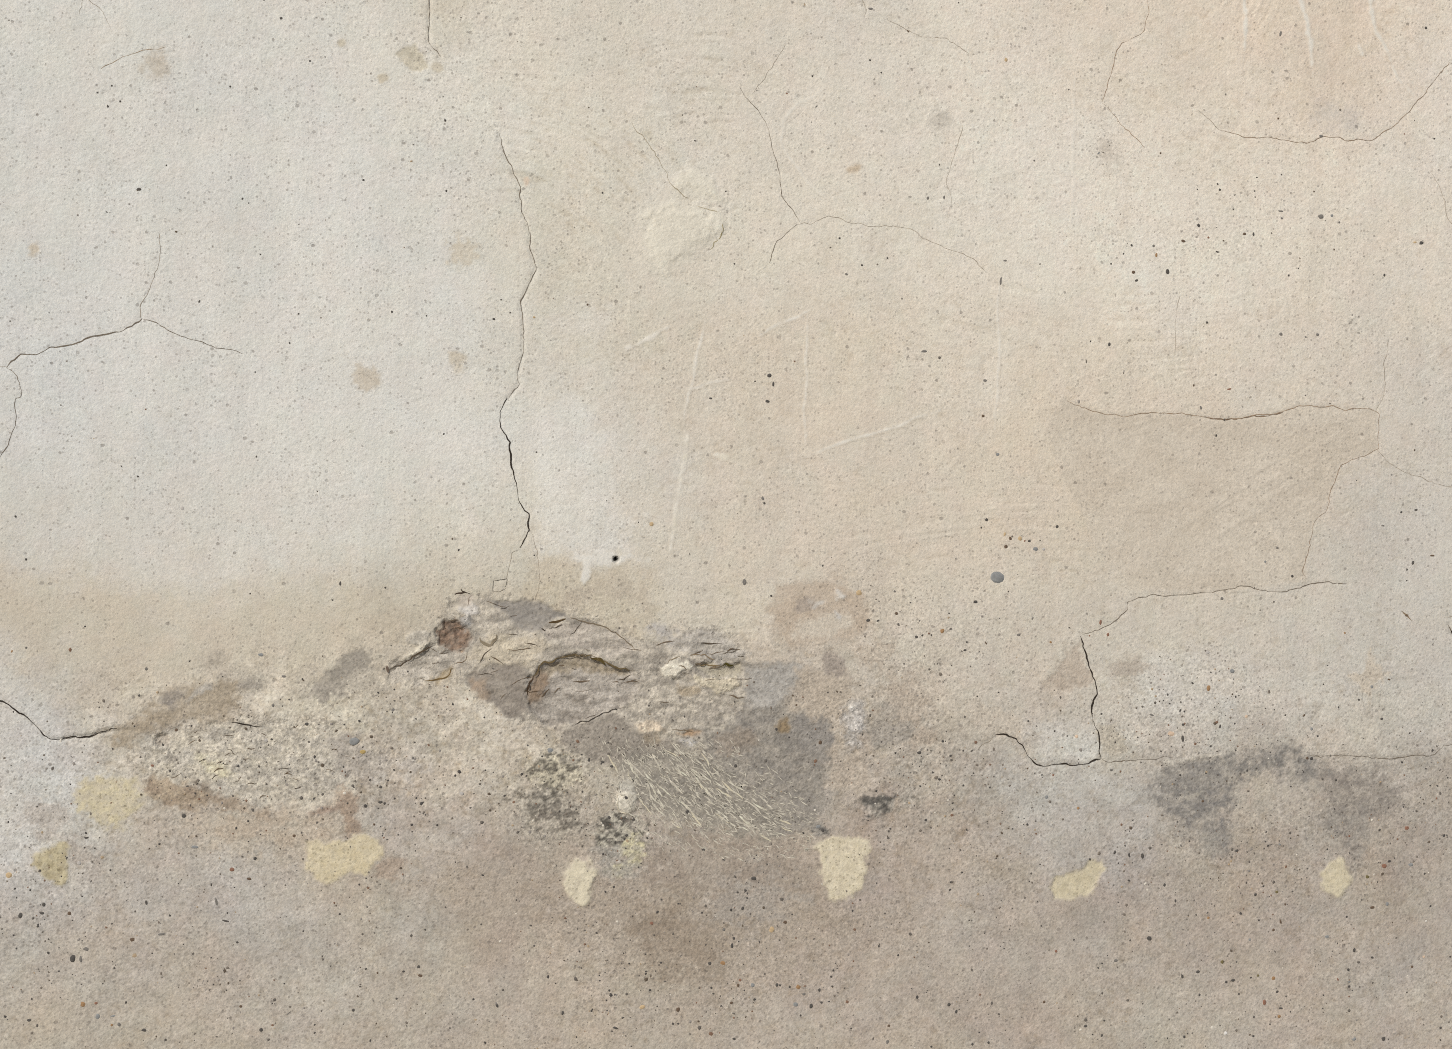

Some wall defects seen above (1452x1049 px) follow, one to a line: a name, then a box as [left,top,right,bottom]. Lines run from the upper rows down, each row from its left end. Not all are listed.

crack [740,46,984,270]
crack [1199,64,1449,143]
crack [0,234,242,457]
crack [493,135,540,599]
crack [979,343,1450,766]
crack [0,700,117,740]
leakage [100,645,267,754]
leakage [141,722,399,868]
spalling [124,588,754,808]
leakage [371,568,1050,1036]
leakage [1140,736,1412,879]